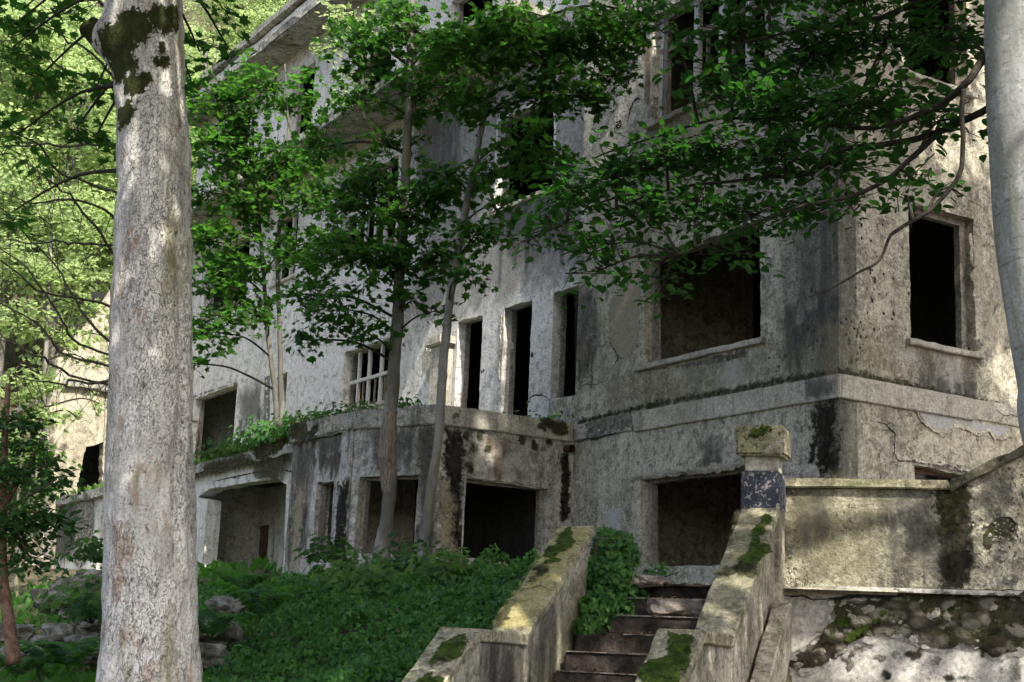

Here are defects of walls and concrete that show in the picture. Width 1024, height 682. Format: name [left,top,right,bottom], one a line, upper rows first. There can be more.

leakage [285,433,350,565]
leakage [395,425,468,572]
leakage [560,452,572,522]
leakage [786,202,845,551]
crack [876,421,914,463]
leakage [888,473,1009,591]
flaking render [915,411,1016,441]